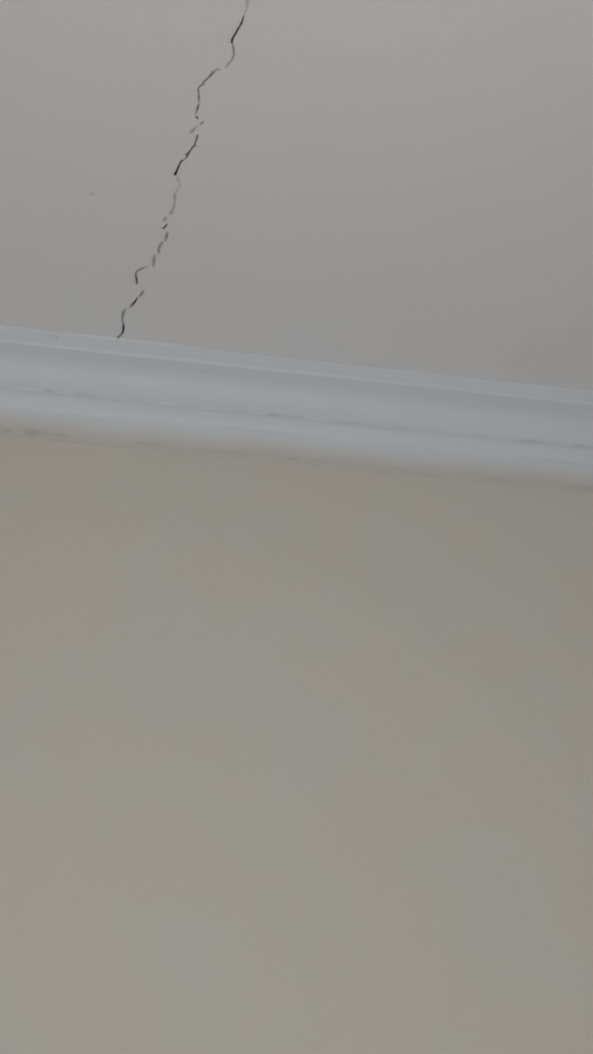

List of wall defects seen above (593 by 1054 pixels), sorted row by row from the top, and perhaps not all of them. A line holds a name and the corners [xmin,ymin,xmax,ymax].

crack [229,17,243,43]
crack [172,84,203,176]
crack [115,277,138,338]